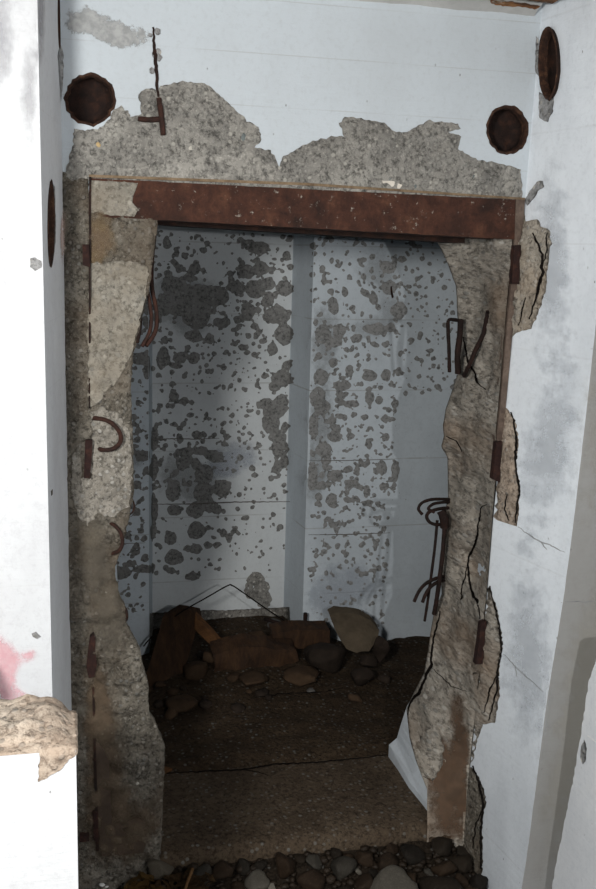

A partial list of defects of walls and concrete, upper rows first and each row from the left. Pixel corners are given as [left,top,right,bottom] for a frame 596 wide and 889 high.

spalling [38,81,554,889]
corrosion [437,509,449,530]